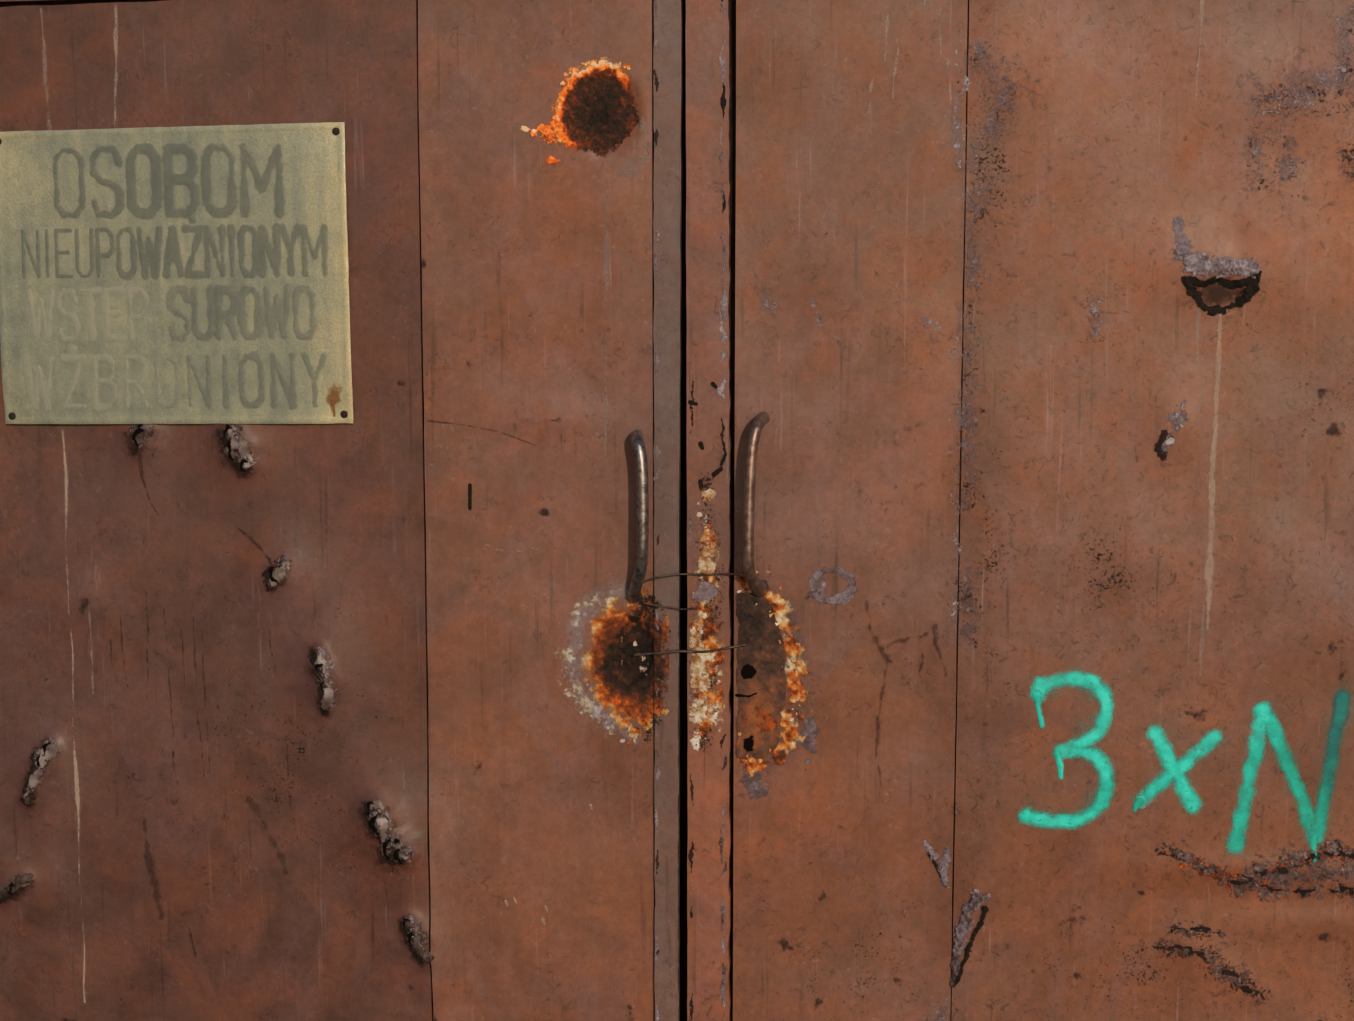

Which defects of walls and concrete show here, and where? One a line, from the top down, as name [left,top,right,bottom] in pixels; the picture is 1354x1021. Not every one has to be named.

corrosion [555,588,671,746]
corrosion [689,472,725,752]